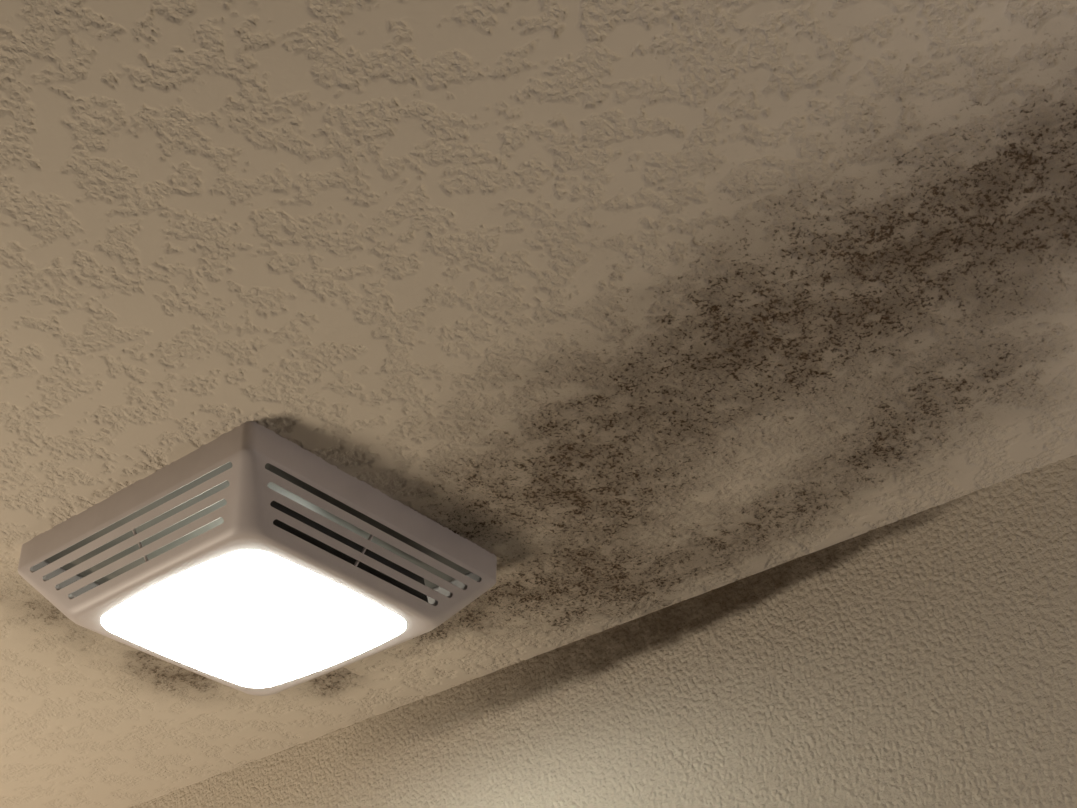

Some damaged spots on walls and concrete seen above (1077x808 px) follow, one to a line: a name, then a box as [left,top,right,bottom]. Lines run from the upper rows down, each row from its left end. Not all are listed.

water stain [413,103,1077,678]
water stain [310,668,358,695]